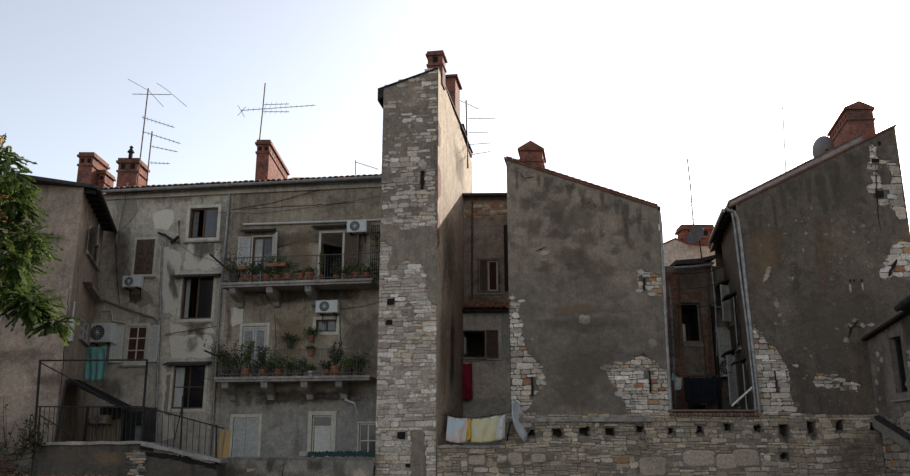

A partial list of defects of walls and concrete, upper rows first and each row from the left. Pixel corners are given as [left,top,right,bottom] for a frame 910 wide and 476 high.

flaking render [381,68,441,248]
flaking render [865,141,907,222]
flaking render [636,269,663,296]
flaking render [879,237,910,282]
peeling [128,242,221,441]
flaking render [374,242,437,476]
flaking render [509,296,546,413]
flaking render [600,354,669,416]
flaking render [750,327,866,416]
flaking render [876,396,910,434]
flaking render [124,450,217,476]